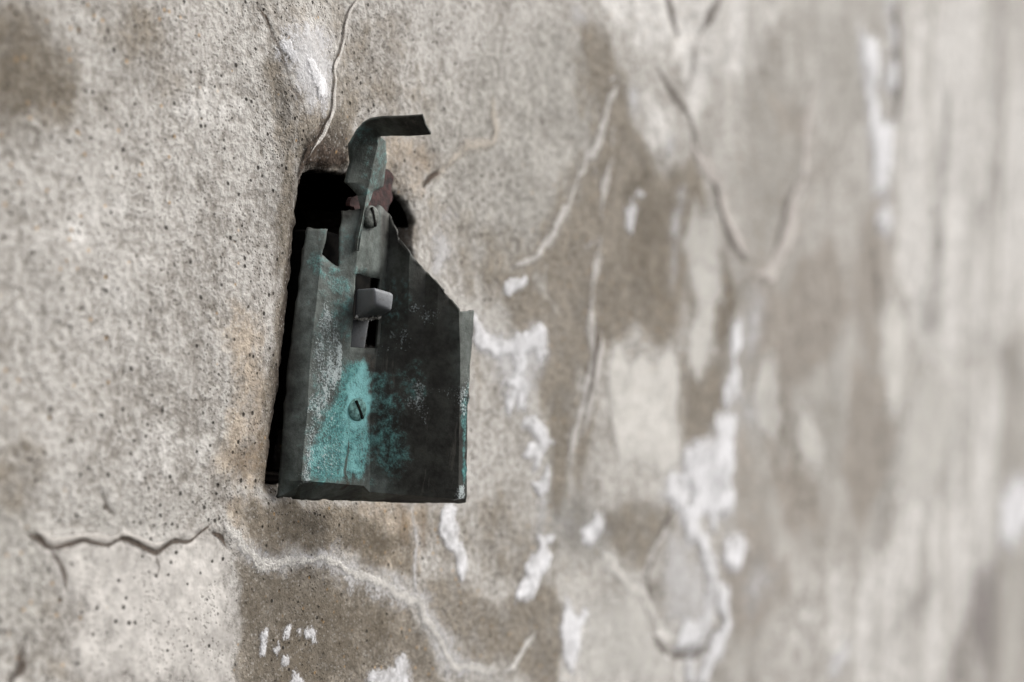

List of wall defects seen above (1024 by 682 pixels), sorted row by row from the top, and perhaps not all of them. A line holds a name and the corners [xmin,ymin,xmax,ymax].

crack [305,0,358,163]
efflorescence [503,275,528,296]
efflorescence [473,314,554,517]
crack [24,493,227,593]
efflorescence [439,503,468,581]
efflorescence [516,534,555,602]
damp [259,625,317,682]
efflorescence [368,653,412,682]